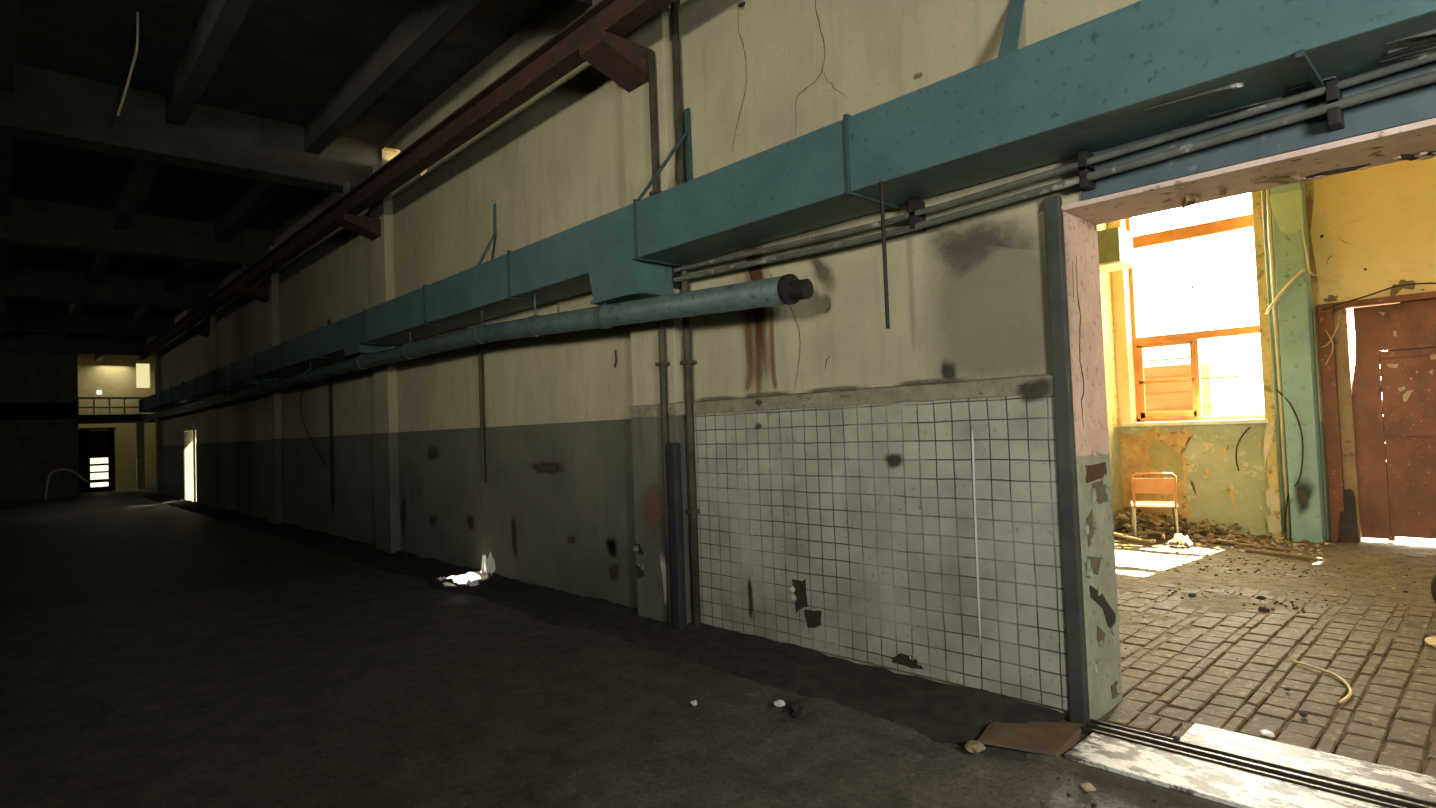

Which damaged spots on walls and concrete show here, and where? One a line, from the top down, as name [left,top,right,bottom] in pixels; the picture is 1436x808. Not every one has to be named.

crack [732,3,747,148]
crack [795,0,850,135]
corrosion [746,249,763,282]
damp [942,225,1006,270]
corrosion [746,307,776,393]
flaking render [1084,426,1240,647]
peeling [790,579,822,630]
peeling [888,653,924,670]
peeling [1111,681,1122,699]